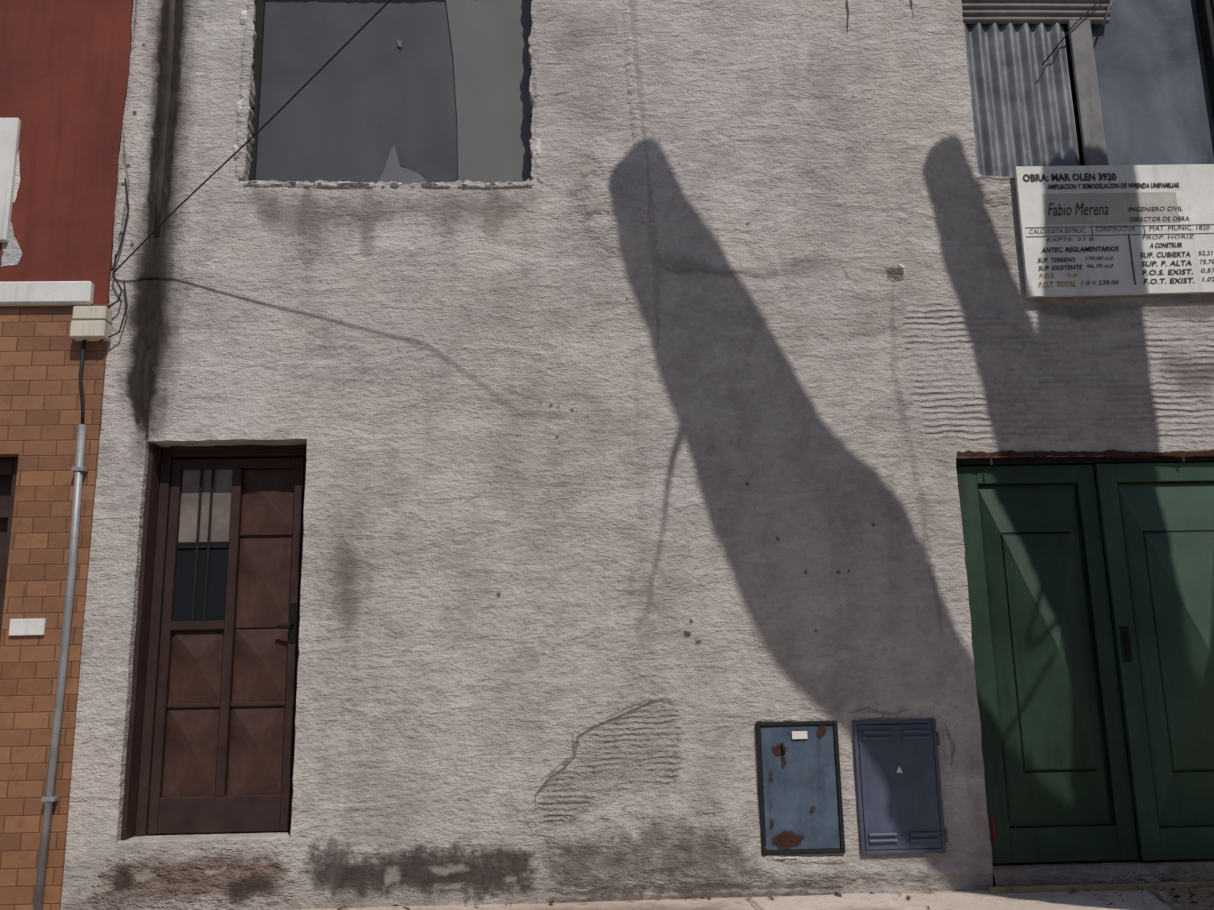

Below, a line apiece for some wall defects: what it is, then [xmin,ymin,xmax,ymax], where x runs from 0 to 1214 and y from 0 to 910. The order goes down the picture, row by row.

crack [843,0,851,31]
flaking render [233,0,543,189]
damp [129,0,183,439]
flaking render [524,691,687,836]
damp [306,844,534,900]
damp [555,882,844,896]